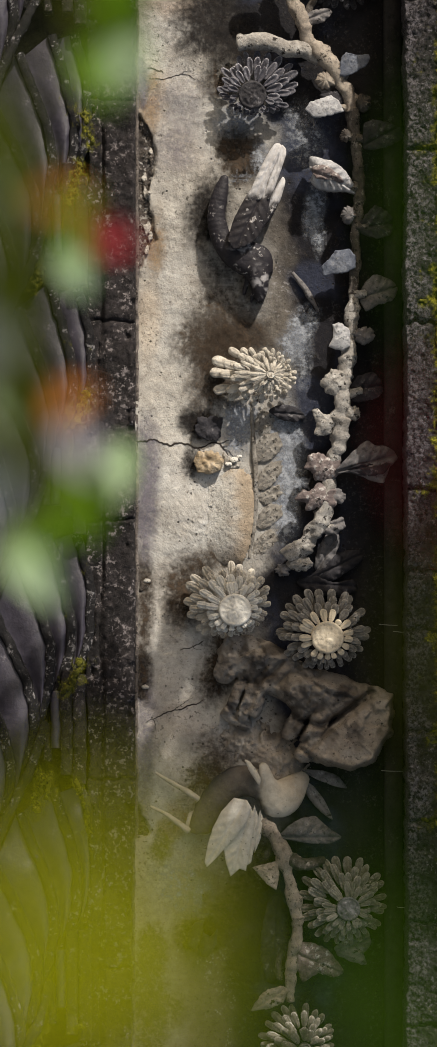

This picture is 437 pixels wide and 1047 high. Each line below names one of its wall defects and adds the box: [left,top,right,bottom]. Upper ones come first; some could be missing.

crack [136,439,244,457]